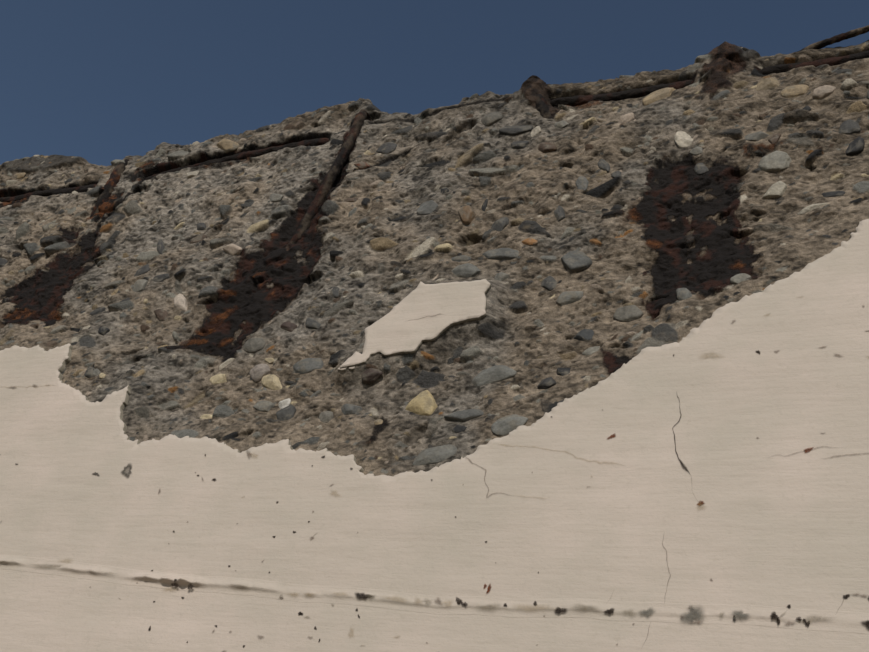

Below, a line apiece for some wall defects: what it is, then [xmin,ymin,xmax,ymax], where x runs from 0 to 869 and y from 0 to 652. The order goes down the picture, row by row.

corrosion [521,75,559,119]
corrosion [692,41,762,99]
corrosion [126,132,331,181]
corrosion [742,141,784,158]
corrosion [0,181,124,326]
corrosion [165,111,371,362]
spalling [0,40,869,476]
corrosion [626,152,762,319]
crack [672,392,690,474]